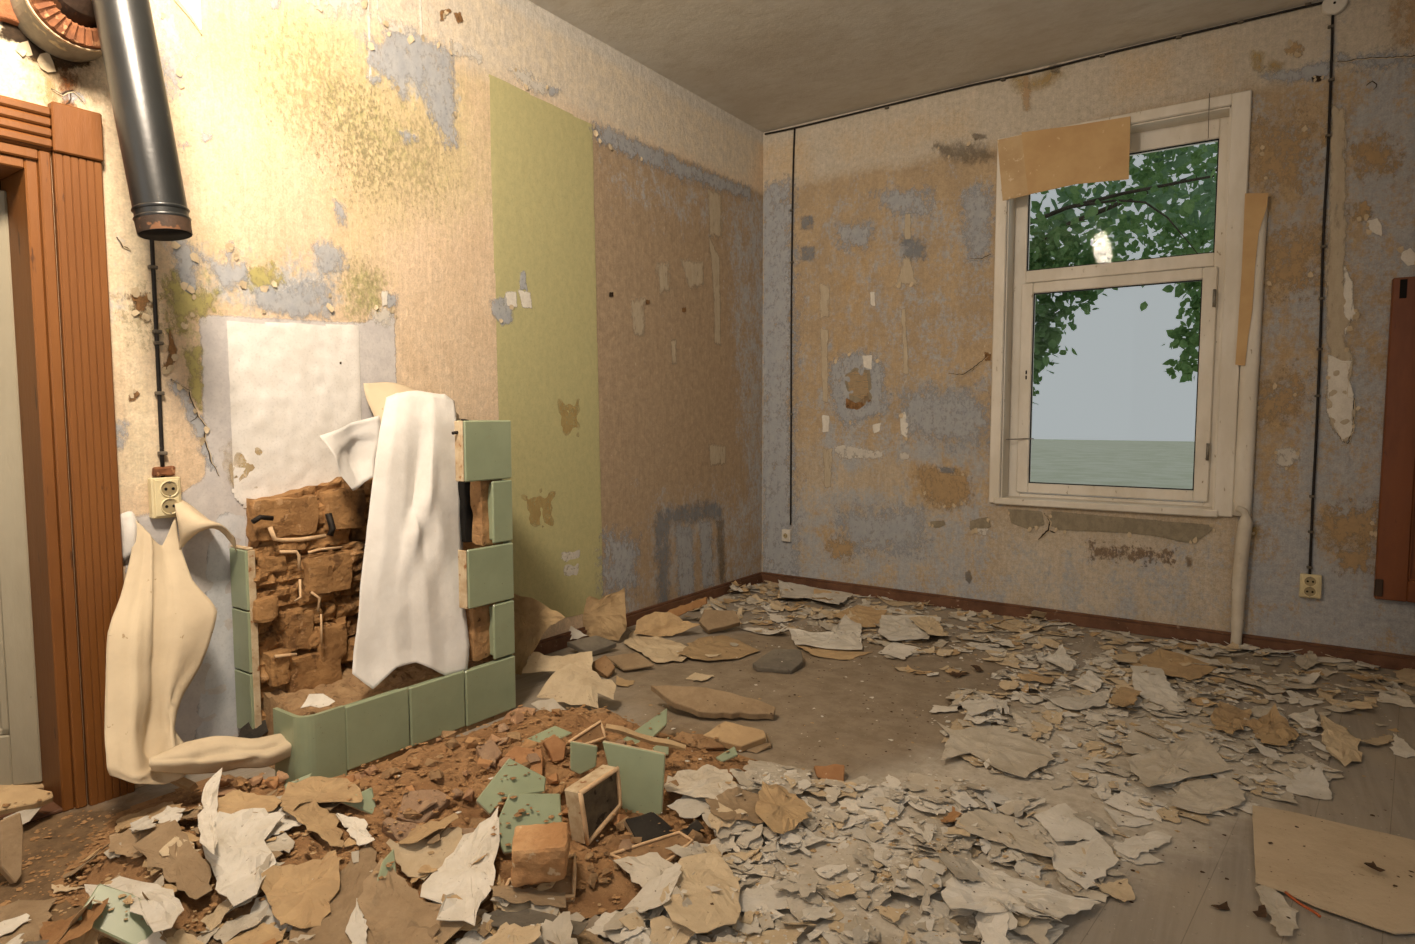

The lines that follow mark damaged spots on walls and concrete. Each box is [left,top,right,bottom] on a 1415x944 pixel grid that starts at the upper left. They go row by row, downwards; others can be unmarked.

peeling [153,6,197,99]
peeling [306,0,482,148]
peeling [835,187,934,251]
peeling [1265,104,1382,442]
peeling [116,420,129,449]
flaking render [127,240,398,742]
peeling [592,123,814,576]
flaking render [819,284,991,488]
flaking render [1008,509,1215,544]
peeling [1307,498,1379,575]